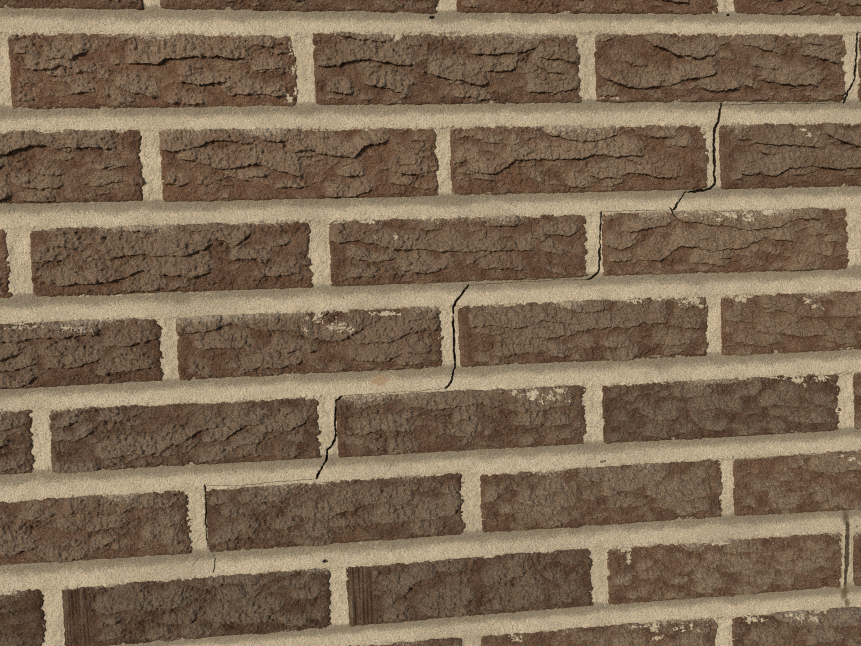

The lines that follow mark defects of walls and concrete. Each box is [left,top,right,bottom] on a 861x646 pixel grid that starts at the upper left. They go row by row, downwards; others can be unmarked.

crack [192,32,861,573]